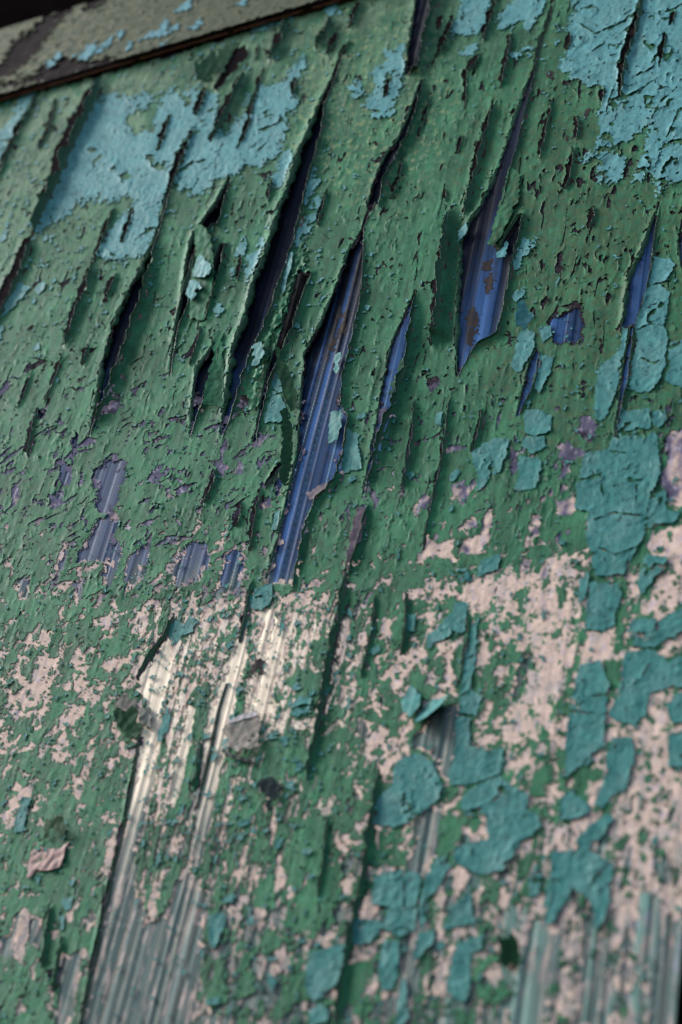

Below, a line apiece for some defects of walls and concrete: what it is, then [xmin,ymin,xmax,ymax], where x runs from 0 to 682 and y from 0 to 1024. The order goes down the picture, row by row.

peeling [31,40,307,265]
peeling [185,223,225,321]
peeling [229,236,265,283]
peeling [281,167,321,292]
peeling [457,222,468,242]
peeling [487,167,536,274]
peeling [558,0,682,198]
peeling [203,332,225,409]
peeling [251,332,297,531]
peeling [45,432,151,597]
peeling [267,256,682,1024]
peeling [0,542,330,1024]